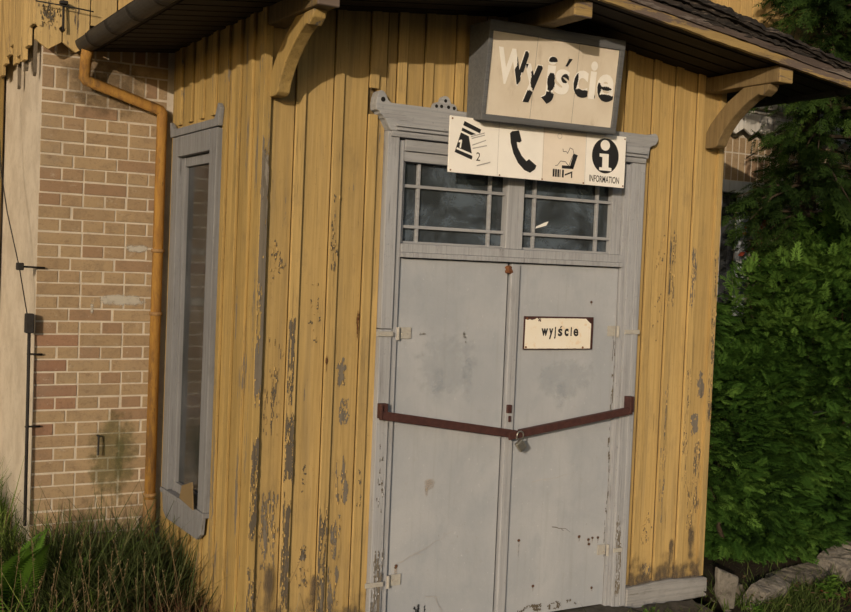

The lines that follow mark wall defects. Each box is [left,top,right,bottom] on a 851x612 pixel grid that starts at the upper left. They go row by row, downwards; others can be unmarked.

peeling [656,230,677,307]
peeling [246,137,341,612]
peeling [336,357,346,387]
peeling [339,398,350,425]
peeling [682,248,719,533]
peeling [335,455,348,505]
peeling [370,549,384,612]
peeling [517,599,576,612]